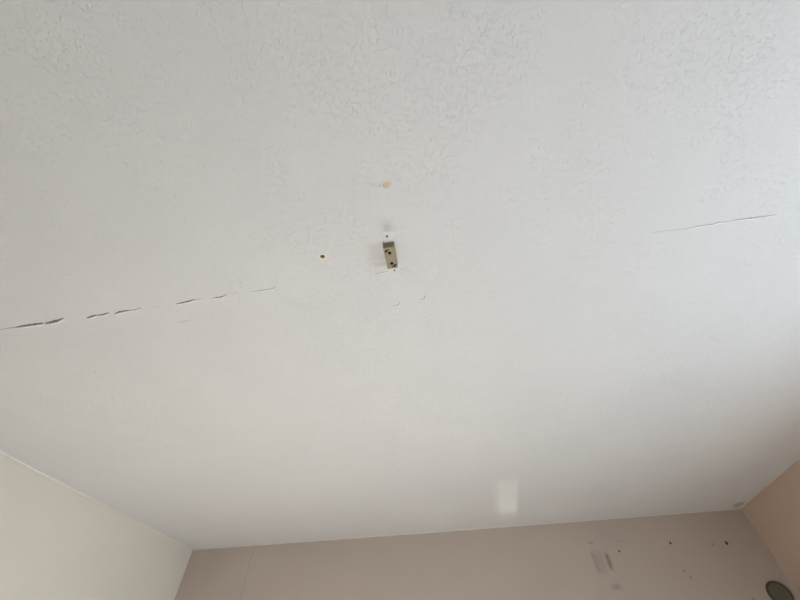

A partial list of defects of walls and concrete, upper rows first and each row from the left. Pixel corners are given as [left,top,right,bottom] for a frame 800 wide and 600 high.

crack [652,215,776,233]
crack [87,307,142,319]
crack [176,295,226,323]
crack [0,318,65,330]